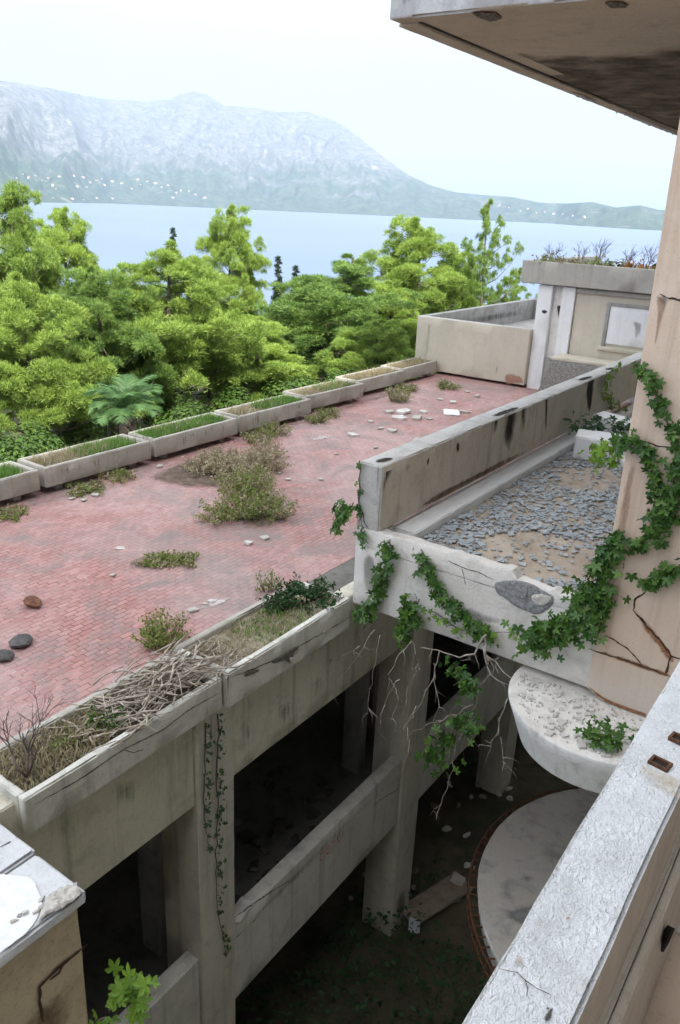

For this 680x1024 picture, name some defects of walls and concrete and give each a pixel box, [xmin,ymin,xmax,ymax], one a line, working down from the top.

leakage [539,52,680,130]
leakage [580,376,594,411]
spalling [494,580,553,614]
crack [591,592,680,677]
peeling [0,874,81,953]
crack [38,944,87,1022]